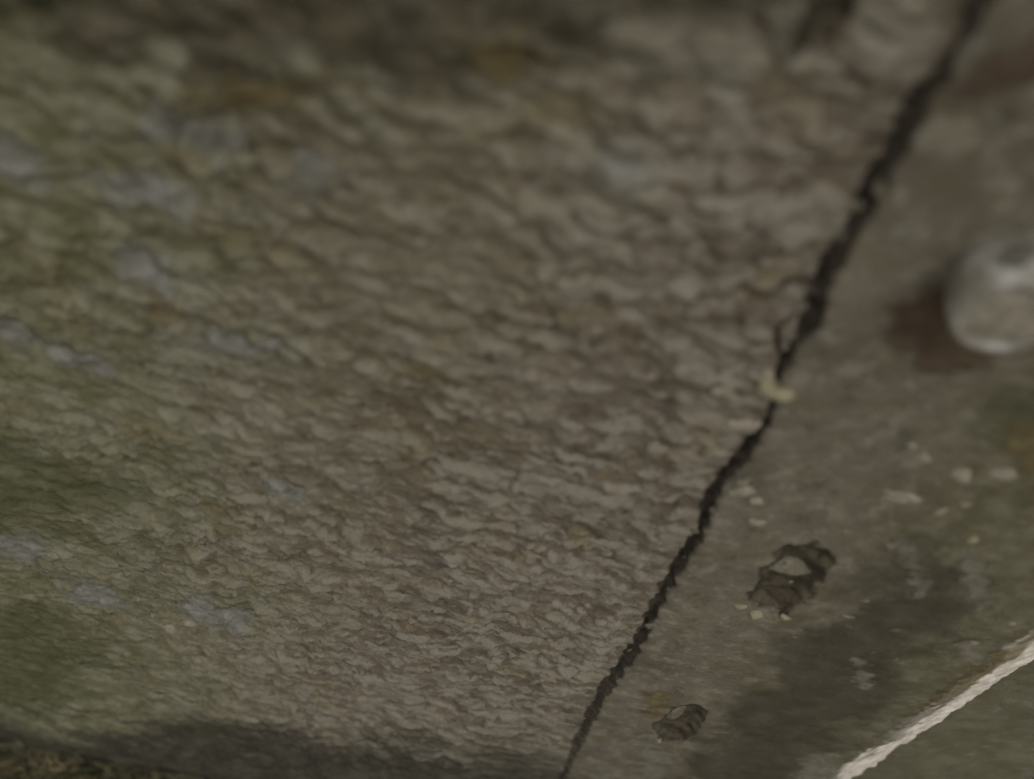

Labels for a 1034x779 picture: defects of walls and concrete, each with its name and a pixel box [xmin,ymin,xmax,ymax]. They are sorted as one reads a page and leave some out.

rust [887,288,996,374]
crack [560,0,981,775]
spalling [881,489,922,504]
spalling [950,468,971,484]
spalling [989,467,1017,481]
spalling [734,542,835,620]
spalling [651,704,707,743]
spalling [830,634,1034,779]